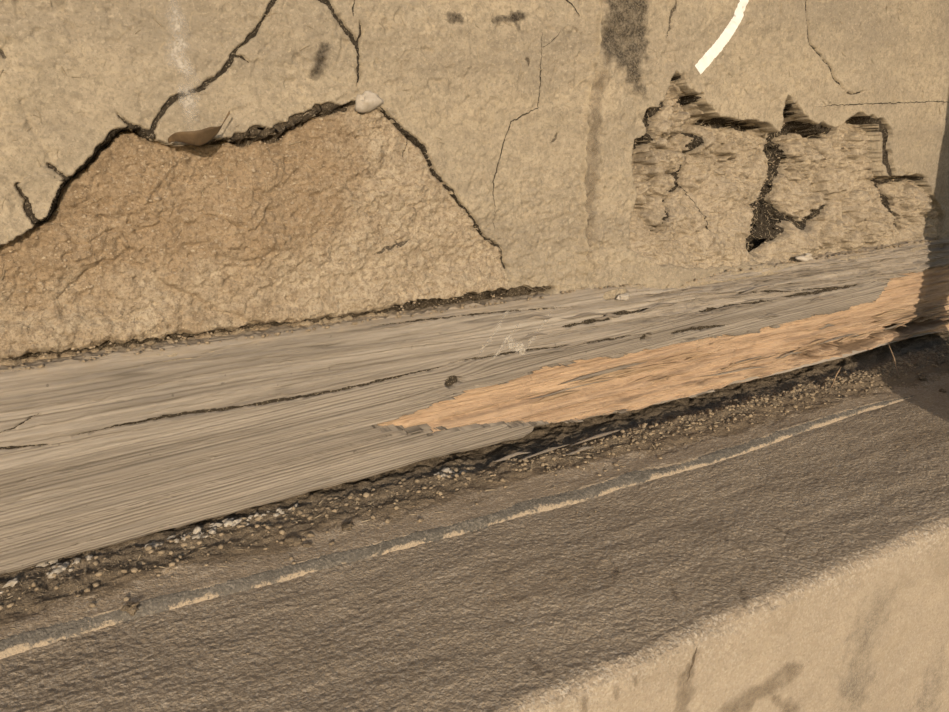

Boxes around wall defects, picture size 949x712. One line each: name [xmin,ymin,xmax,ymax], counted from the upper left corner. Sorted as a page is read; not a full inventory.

crack [16,0,277,225]
spalling [0,90,551,366]
crack [318,0,361,83]
crack [380,32,560,269]
water stain [602,0,647,91]
spalling [627,80,938,269]
crack [633,2,949,244]